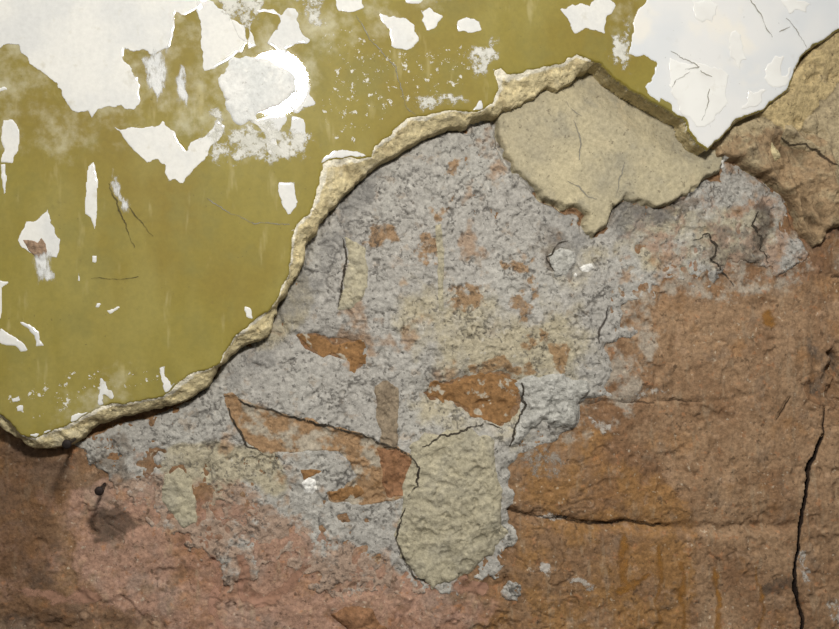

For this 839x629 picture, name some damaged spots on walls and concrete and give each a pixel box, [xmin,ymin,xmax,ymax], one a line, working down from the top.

spalling [0,55,705,449]
crack [395,509,431,589]
flaking render [72,120,809,602]
crack [422,383,527,447]
crack [507,509,663,526]
peeling [629,0,839,248]
crack [792,408,825,629]
crack [781,137,838,165]